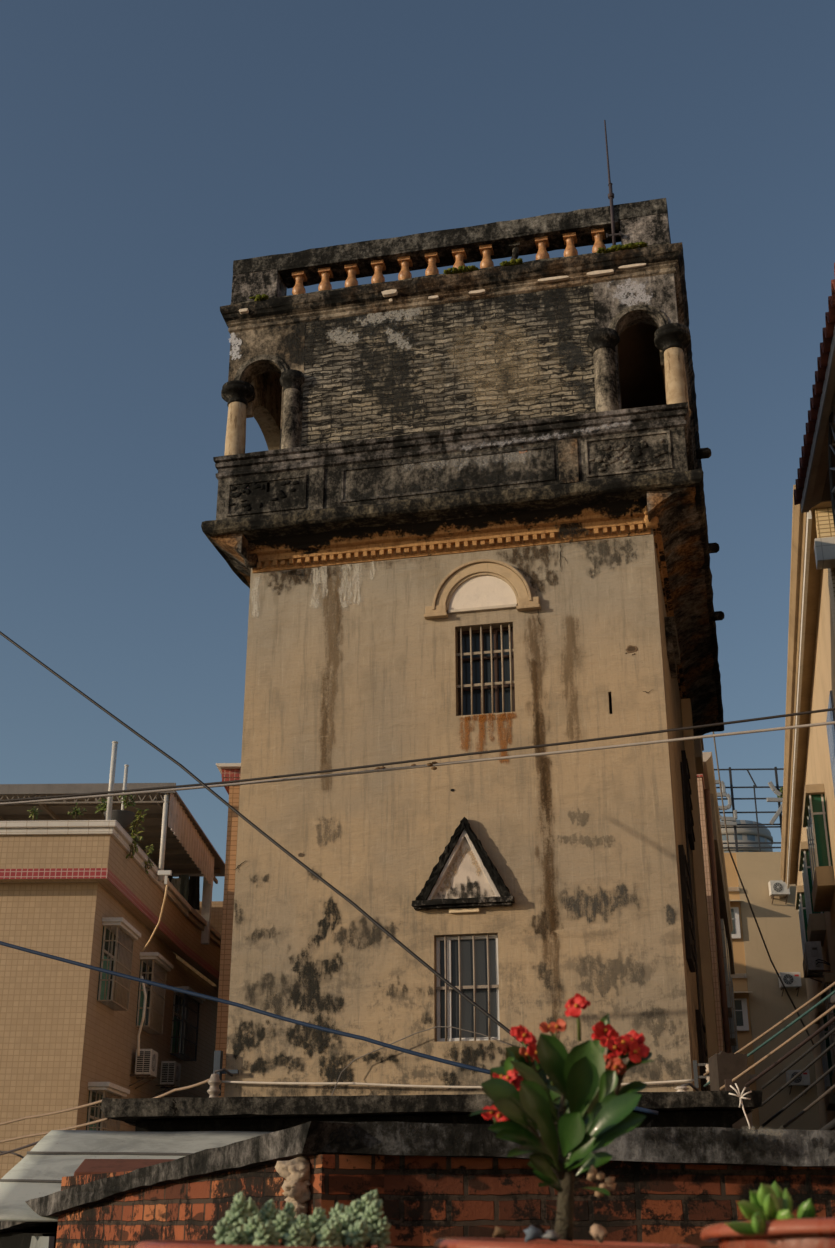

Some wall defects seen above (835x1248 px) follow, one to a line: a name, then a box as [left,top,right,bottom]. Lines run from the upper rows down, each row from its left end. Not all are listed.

water stain [229,333,242,360]
water stain [285,309,429,421]
water stain [495,287,596,408]
water stain [613,279,651,306]
water stain [251,561,375,789]
rust [461,713,516,763]
water stain [529,618,550,823]
water stain [232,899,398,1096]
water stain [531,841,639,1039]
water stain [664,904,675,925]